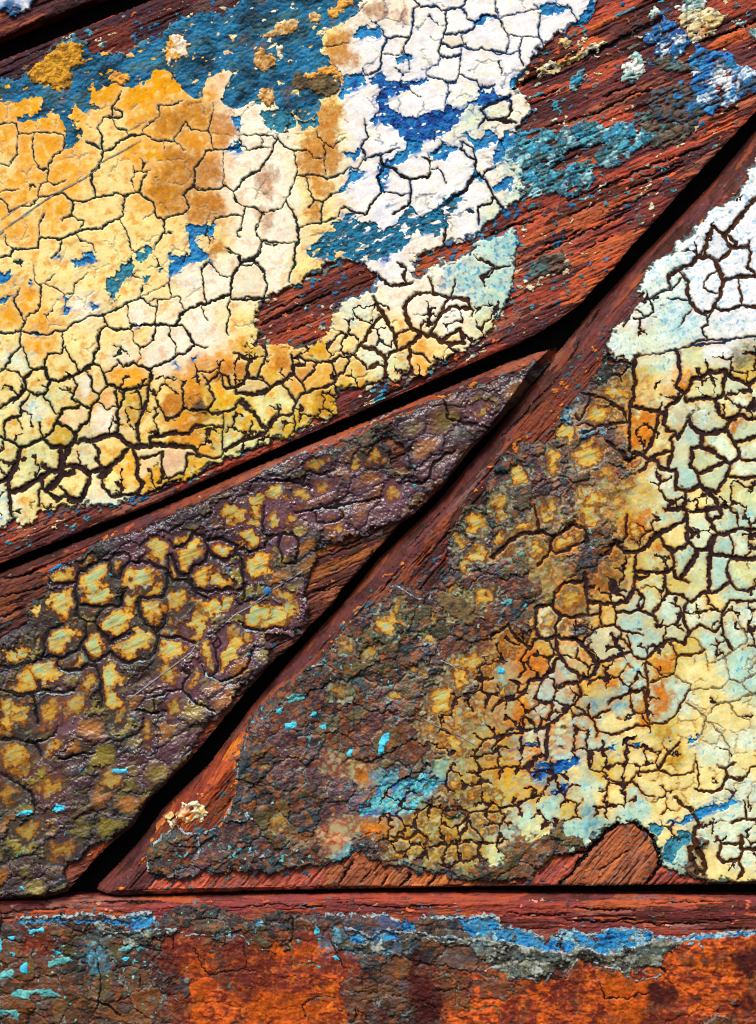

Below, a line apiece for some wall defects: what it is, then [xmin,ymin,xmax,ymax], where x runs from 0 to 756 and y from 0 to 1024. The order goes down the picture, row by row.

peeling [537,1,569,16]
peeling [558,0,595,52]
crack [0,0,700,517]
peeling [243,190,517,353]
crack [0,470,383,760]
crack [246,194,756,1017]
crack [2,774,36,811]
peeling [143,694,484,893]
peeling [513,796,737,885]
crack [0,900,161,914]
peeling [0,913,269,1024]
peeling [309,911,756,982]